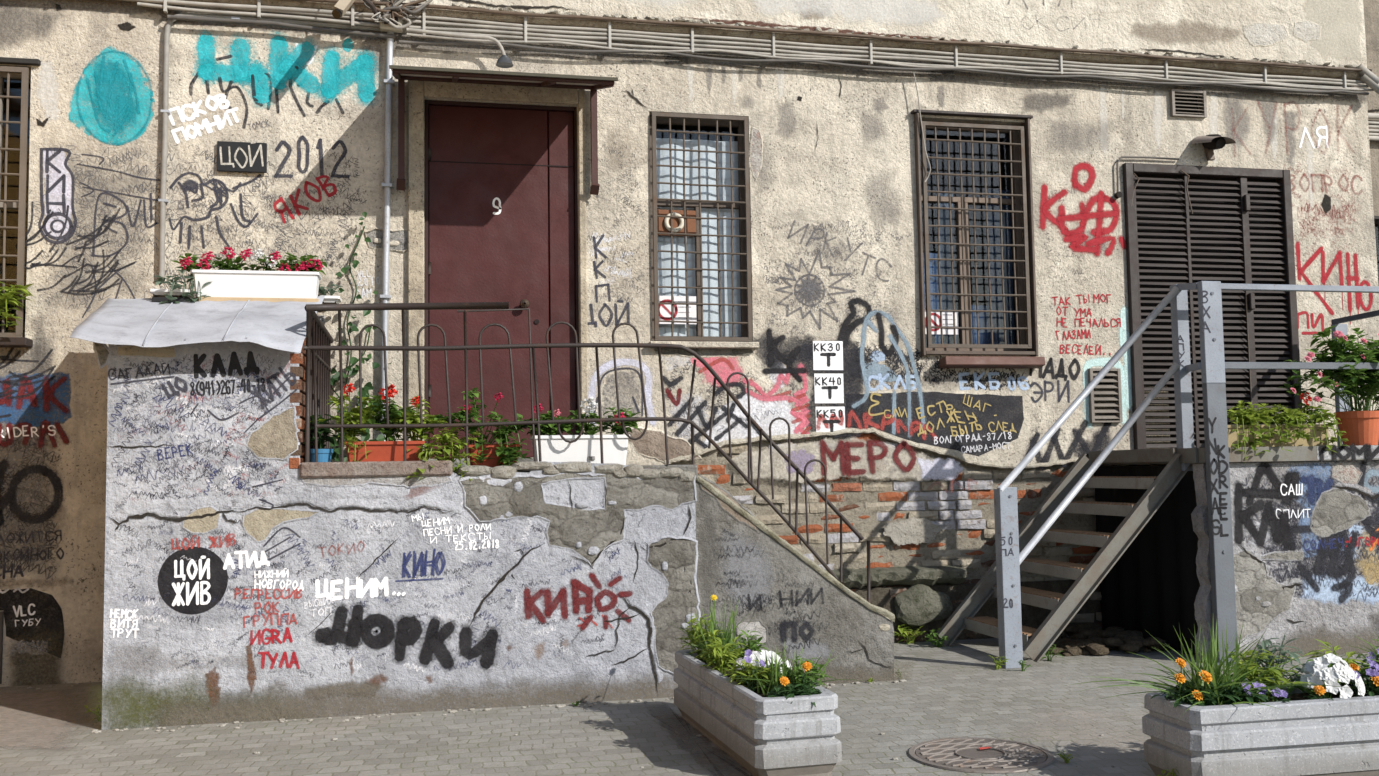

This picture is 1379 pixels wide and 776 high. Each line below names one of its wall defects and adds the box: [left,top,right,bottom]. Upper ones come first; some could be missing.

flaking render [245,406,300,462]
flaking render [182,505,222,535]
flaking render [241,506,320,544]
crack [106,491,463,578]
flaking render [299,426,1079,585]
flaking render [1020,386,1170,582]
flaking render [1309,461,1371,539]
crack [469,481,692,692]